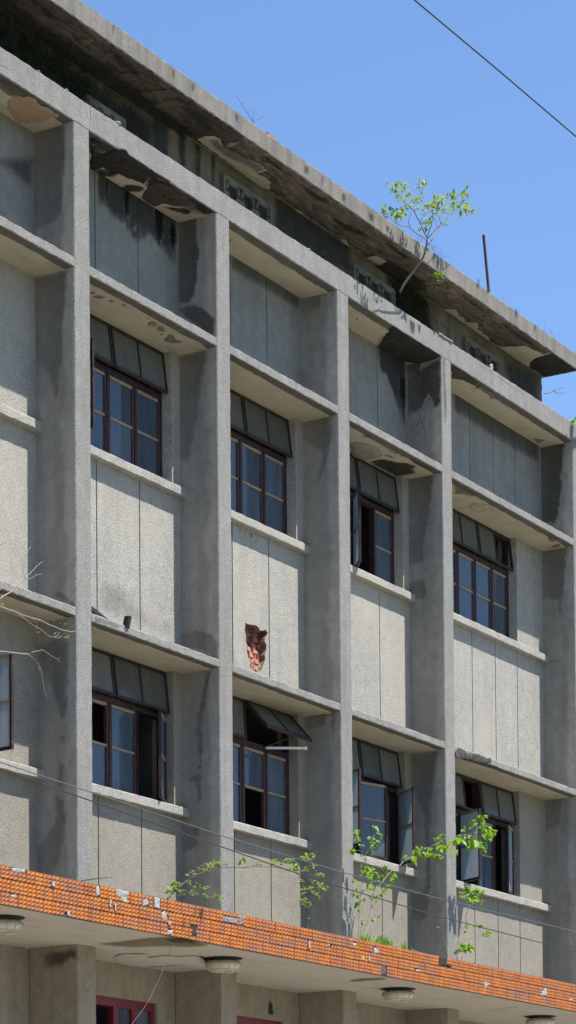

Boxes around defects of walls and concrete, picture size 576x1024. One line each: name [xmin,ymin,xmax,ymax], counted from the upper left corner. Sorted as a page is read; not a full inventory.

spalling [6,0,576,377]
water stain [95,169,214,336]
spalling [245,623,267,672]
peeling [96,886,129,911]
peeling [143,897,172,935]
peeling [222,915,244,924]